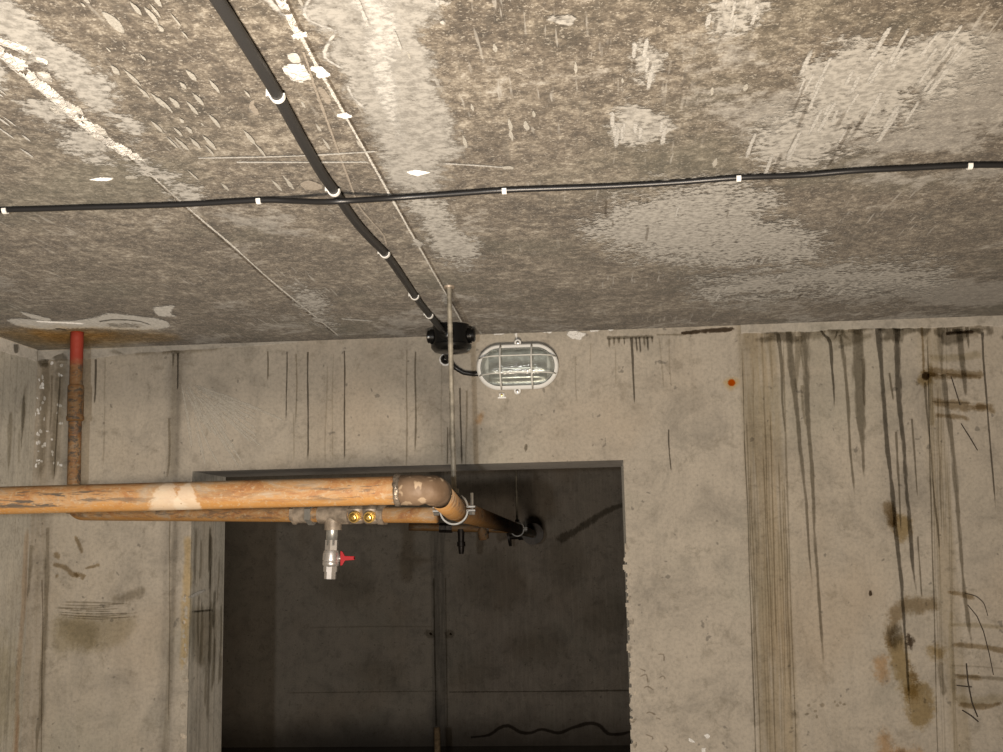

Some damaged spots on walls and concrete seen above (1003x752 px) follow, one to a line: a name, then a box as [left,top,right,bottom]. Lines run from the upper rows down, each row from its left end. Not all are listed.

leakage [0,38,338,336]
leakage [265,0,485,322]